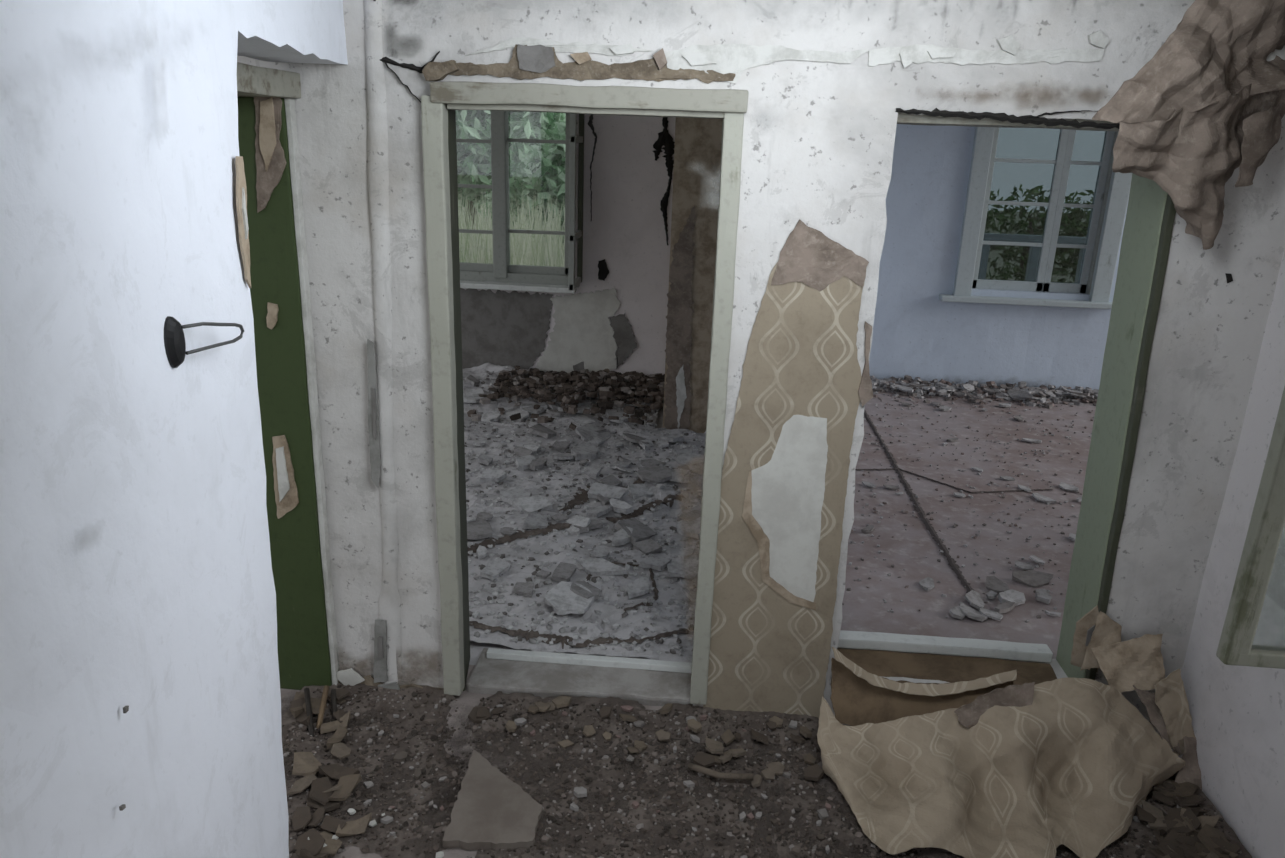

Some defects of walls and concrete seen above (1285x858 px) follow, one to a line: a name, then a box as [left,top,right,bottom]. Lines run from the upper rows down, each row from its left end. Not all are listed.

peeling [235,97,287,288]
crack [653,117,675,245]
peeling [266,302,279,330]
spalling [460,259,637,376]
peeling [272,435,299,519]
peeling [742,415,828,611]